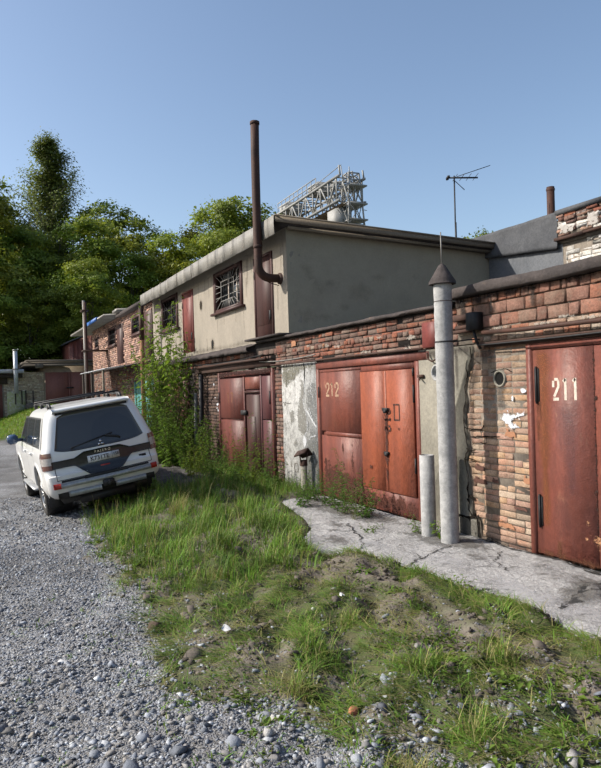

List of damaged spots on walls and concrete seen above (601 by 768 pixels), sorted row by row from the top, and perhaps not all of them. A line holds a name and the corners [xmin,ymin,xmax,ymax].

peeling [583,210,598,225]
leakage [282,363,313,387]
crack [459,347,500,535]
peeling [501,410,524,437]
corrosion [324,458,419,521]
crack [323,523,389,549]
leakage [476,536,601,575]
crack [403,546,522,605]